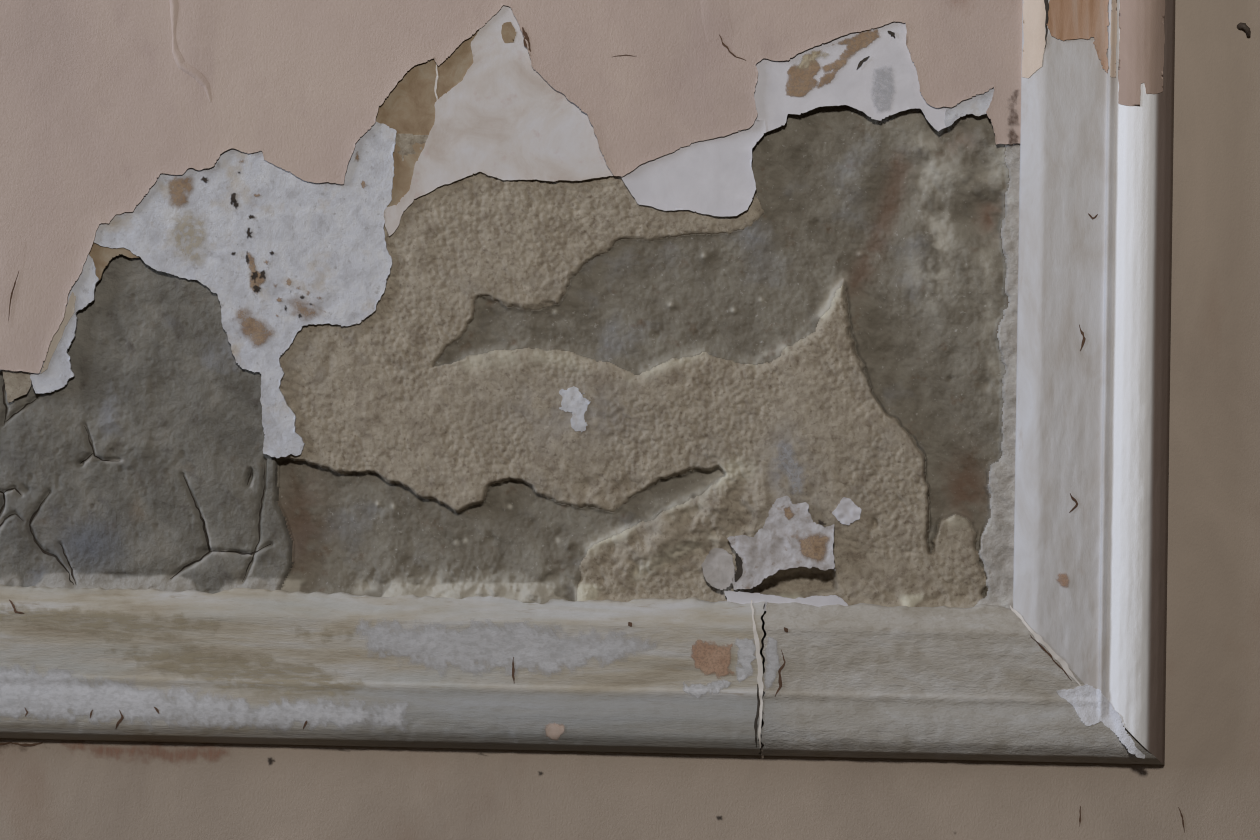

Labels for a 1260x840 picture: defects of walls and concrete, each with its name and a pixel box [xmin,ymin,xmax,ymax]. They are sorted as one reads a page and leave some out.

peeling [1022,0,1165,106]
spalling [0,5,1020,609]
crack [0,488,76,585]
crack [170,468,271,582]
crack [751,600,785,748]